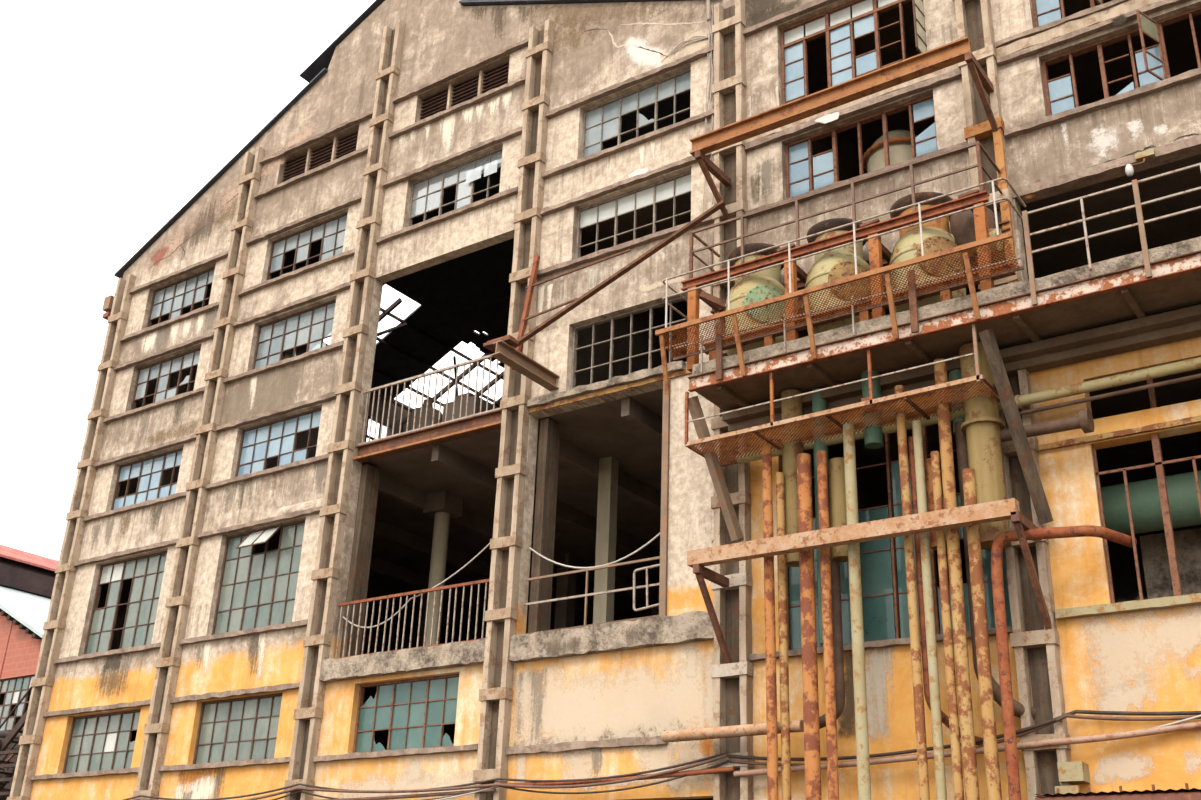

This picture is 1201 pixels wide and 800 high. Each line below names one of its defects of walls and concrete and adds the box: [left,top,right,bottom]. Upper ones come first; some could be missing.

crack [584,21,705,56]
leakage [99,654,132,694]
leakage [196,644,212,673]
leakage [249,632,267,676]
peeling [1085,605,1201,717]